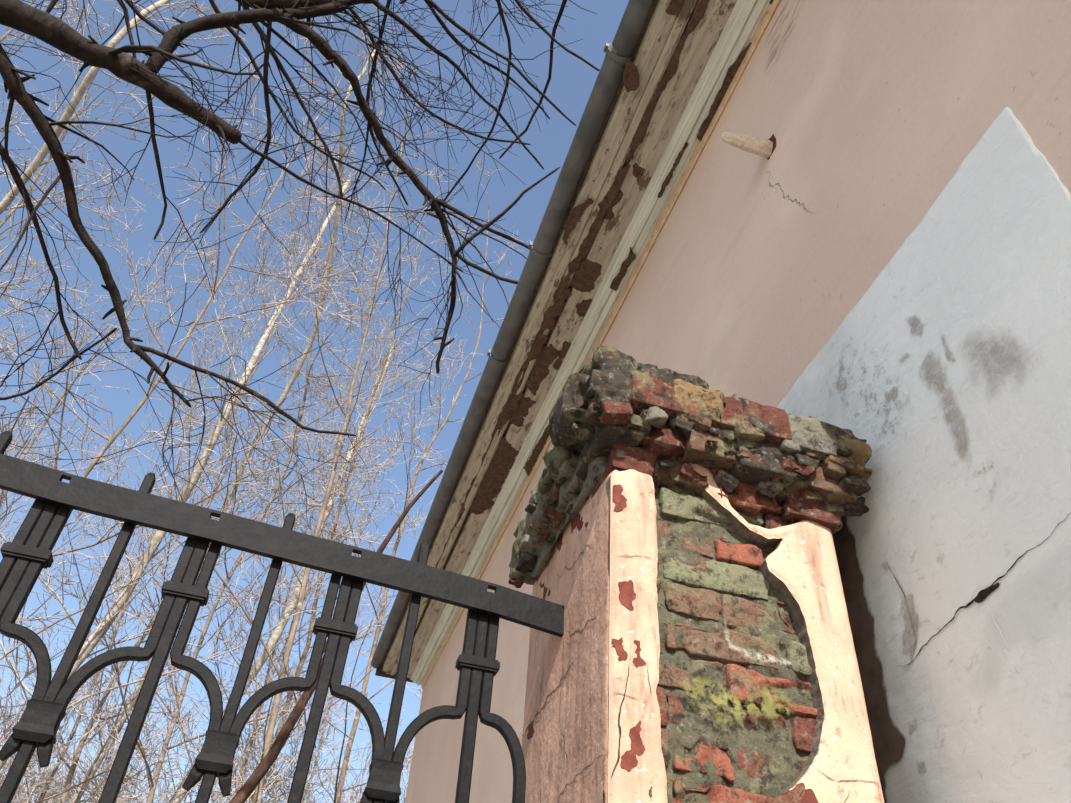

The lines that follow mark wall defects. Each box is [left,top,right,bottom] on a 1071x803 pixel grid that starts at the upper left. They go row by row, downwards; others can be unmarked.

flaking render [657,42,752,198]
crack [765,171,812,213]
peeling [436,0,709,568]
leakage [908,317,922,333]
leakage [865,387,897,433]
leakage [922,337,967,456]
peeling [618,580,636,611]
crack [896,513,1071,667]
peeling [612,638,646,667]
crack [521,663,577,737]
crack [540,648,652,803]
peeling [620,721,645,772]